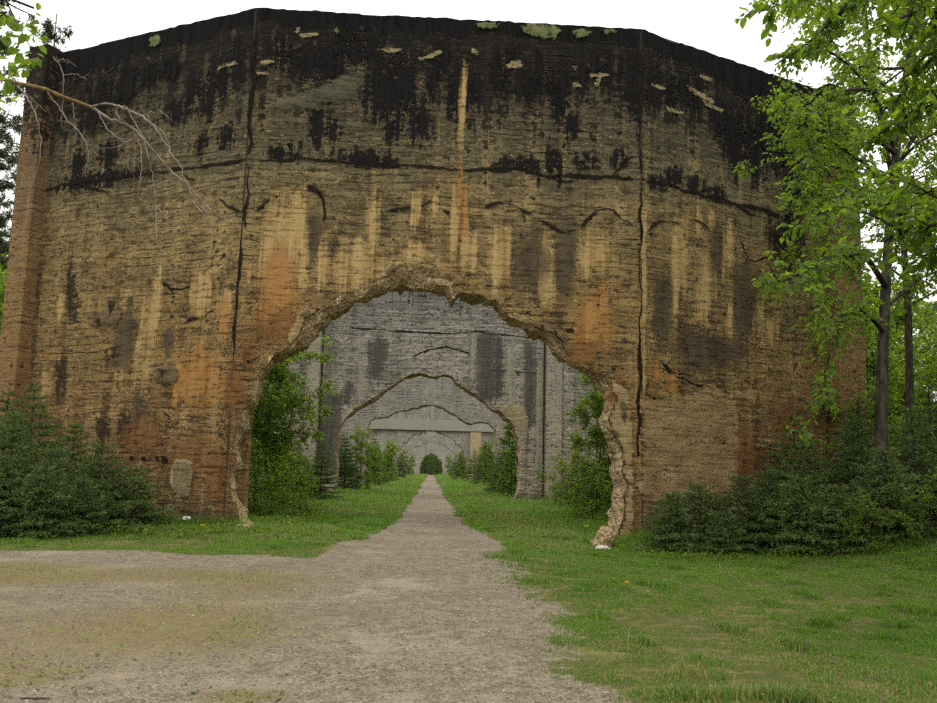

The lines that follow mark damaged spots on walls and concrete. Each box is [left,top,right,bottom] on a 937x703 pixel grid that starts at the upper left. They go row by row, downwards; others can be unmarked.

peeling [688,86,723,112]
crack [46,31,802,457]
water stain [49,9,822,413]
corrosion [457,161,469,243]
water stain [41,352,67,401]